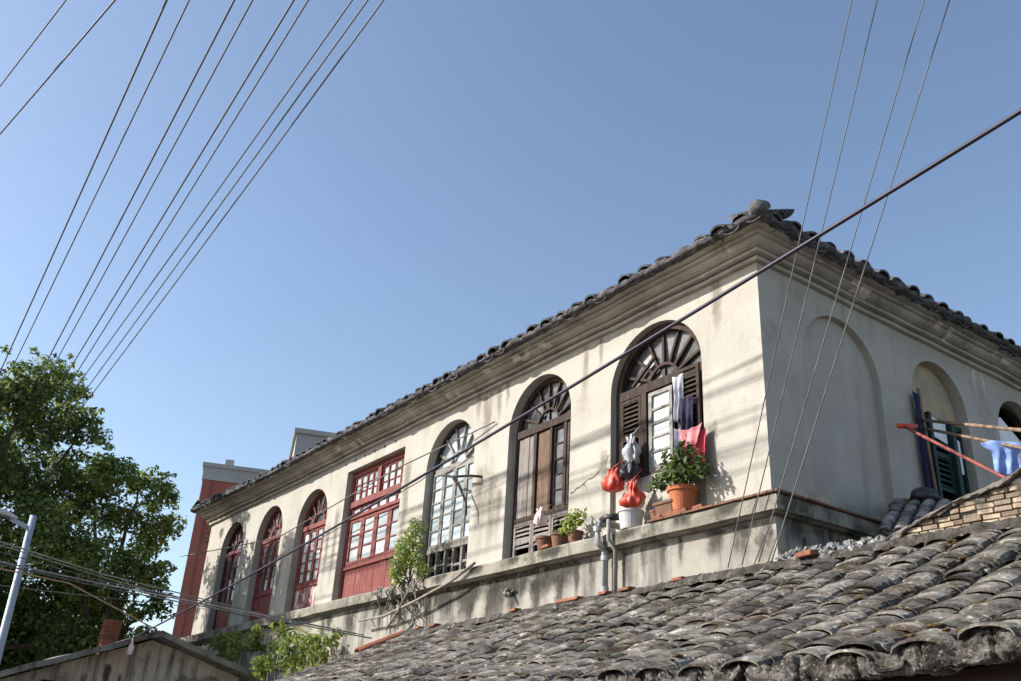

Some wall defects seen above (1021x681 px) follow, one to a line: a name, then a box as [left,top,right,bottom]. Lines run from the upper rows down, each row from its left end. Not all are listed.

damp [373,546,593,625]